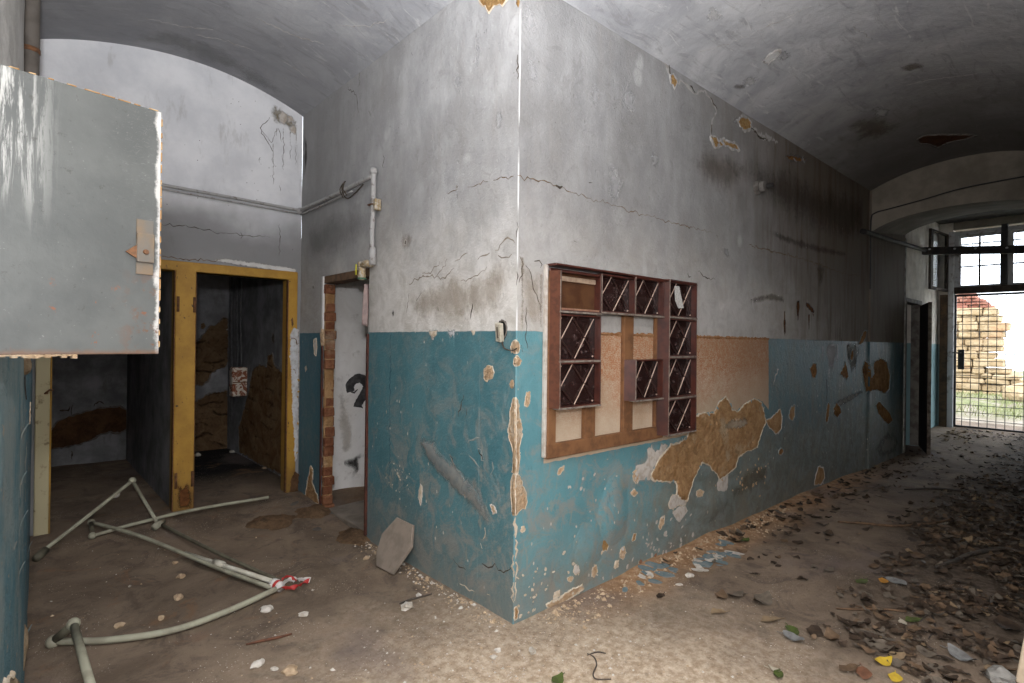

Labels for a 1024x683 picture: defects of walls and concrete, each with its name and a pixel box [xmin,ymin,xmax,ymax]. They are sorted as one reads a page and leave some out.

spalling [478,0,520,14]
crack [259,117,297,189]
spalling [709,114,778,152]
crack [448,175,710,232]
crack [163,223,281,253]
crack [407,224,542,348]
spalling [195,316,307,475]
peeling [483,365,494,382]
spalling [840,349,893,425]
spalling [51,405,127,450]
spalling [507,380,795,621]